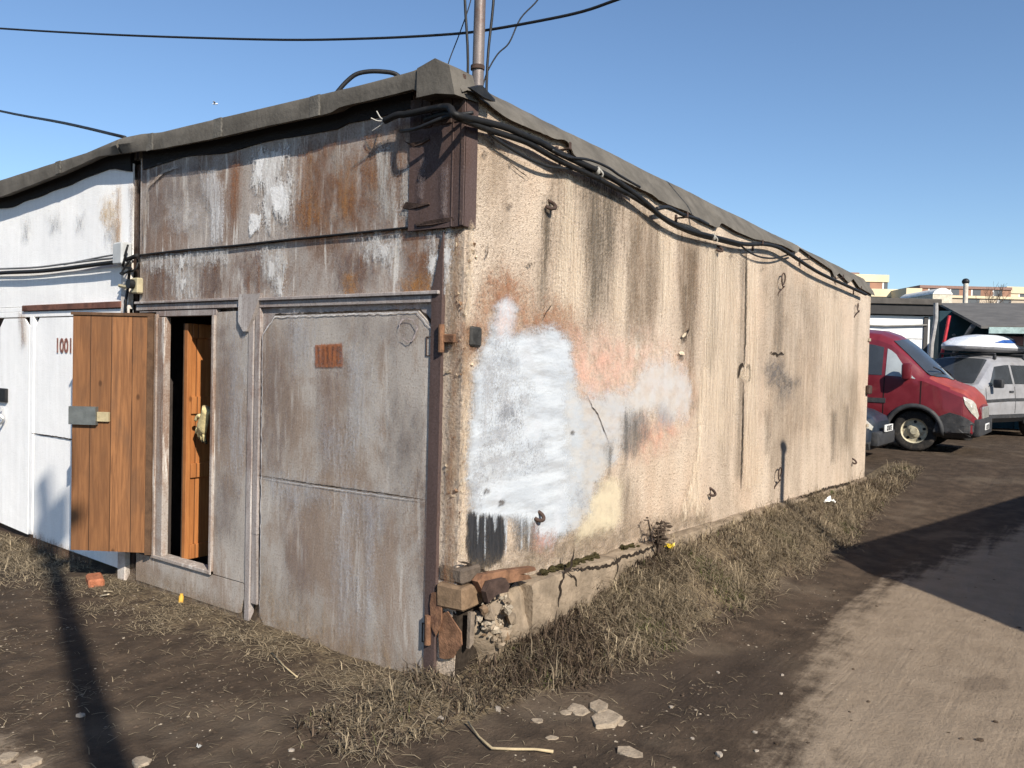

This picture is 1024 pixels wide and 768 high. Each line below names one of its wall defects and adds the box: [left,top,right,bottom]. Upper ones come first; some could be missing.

corrosion [297,136,401,235]
water stain [632,226,736,443]
spalling [473,582,529,663]